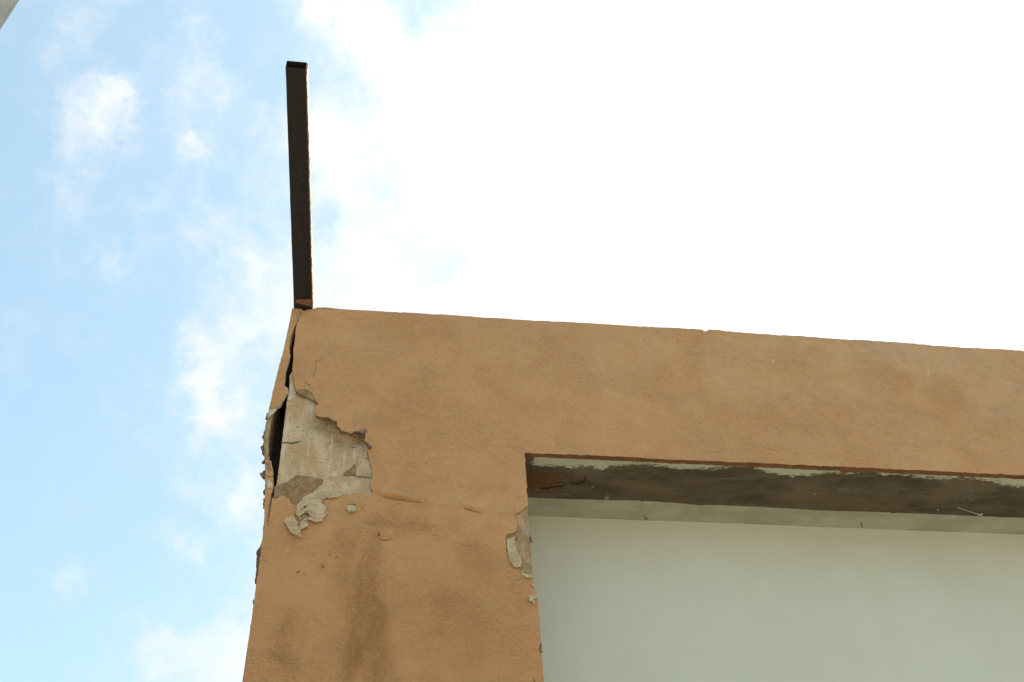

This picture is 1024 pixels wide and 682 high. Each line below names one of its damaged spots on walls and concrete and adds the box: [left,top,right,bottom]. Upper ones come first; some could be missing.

crack [268,345,323,519]
spalling [273,372,373,537]
spalling [506,508,538,604]